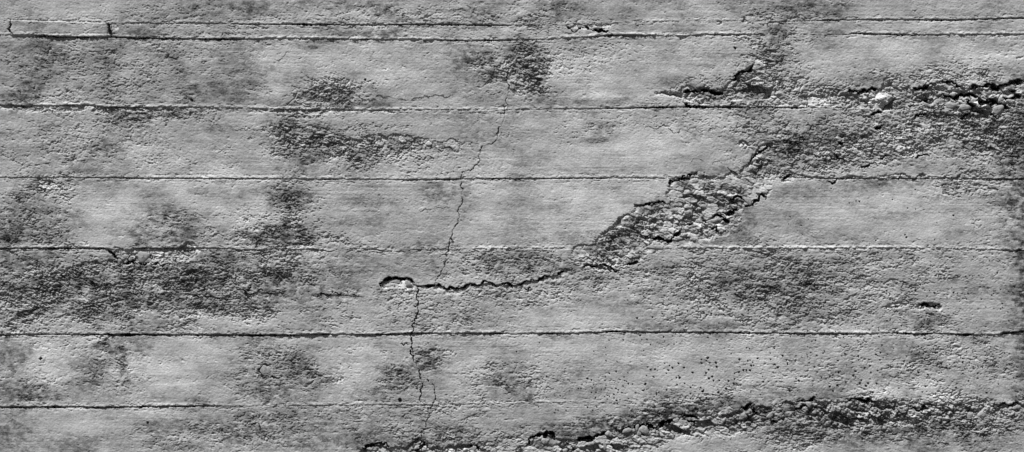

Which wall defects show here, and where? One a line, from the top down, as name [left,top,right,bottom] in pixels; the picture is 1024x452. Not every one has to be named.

crack [336,92,475,104]
spalling [571,57,1024,271]
crack [402,70,617,449]
spalling [360,437,487,452]
spalling [516,279,1024,452]